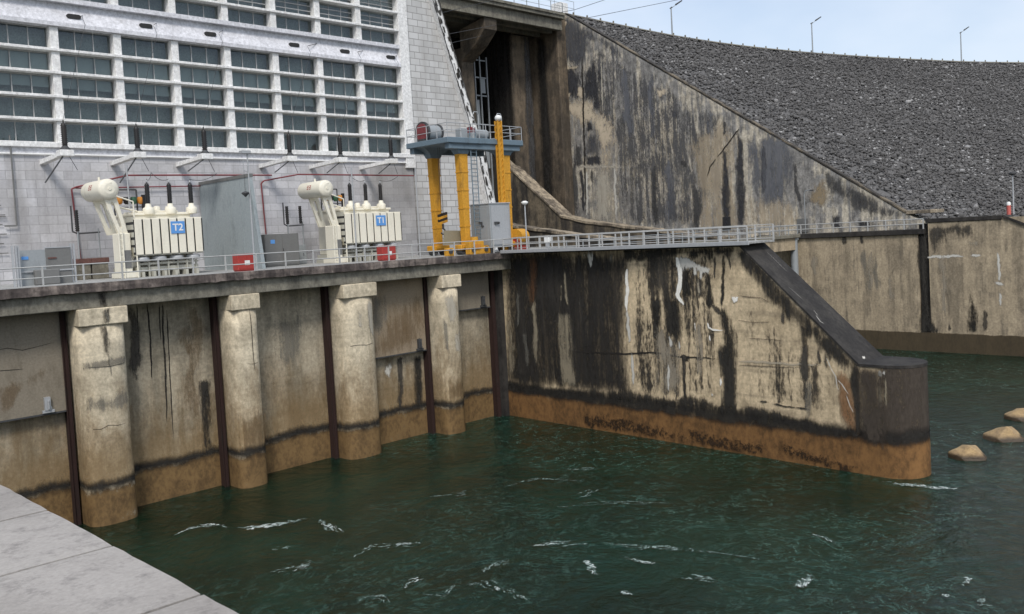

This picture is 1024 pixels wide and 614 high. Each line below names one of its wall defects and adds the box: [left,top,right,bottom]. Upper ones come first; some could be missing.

damp [99,292,109,353]
damp [0,304,494,527]
damp [565,19,801,228]
crack [707,129,739,176]
damp [506,225,1024,489]
damp [826,173,899,286]